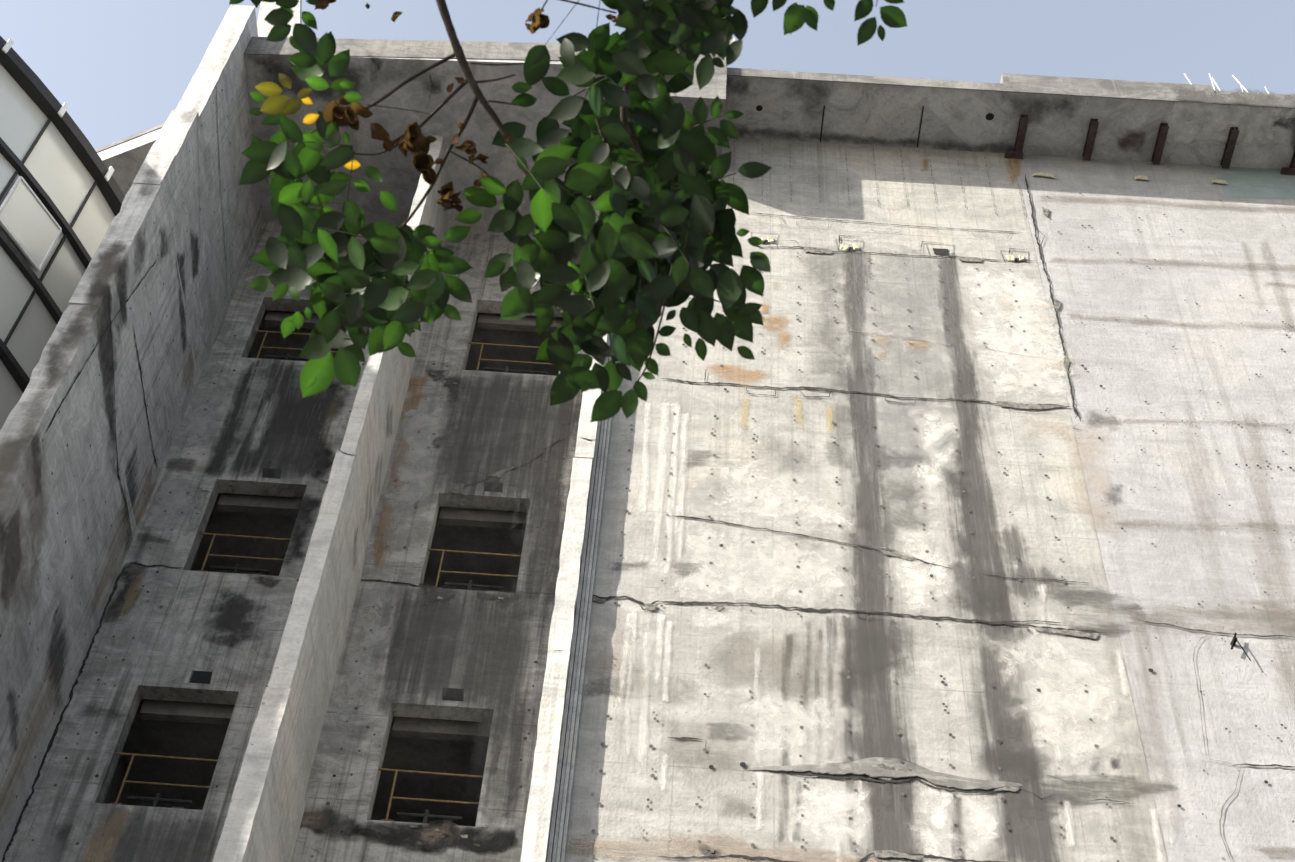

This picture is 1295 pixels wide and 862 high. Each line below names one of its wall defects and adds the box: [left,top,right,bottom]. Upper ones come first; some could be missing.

corrosion [1119,133,1143,148]
crack [661,174,1081,430]
leakage [0,243,126,501]
leakage [568,252,922,862]
leakage [939,253,1174,862]
leakage [48,614,65,691]
leakage [158,593,258,683]
crack [592,595,1107,639]
crack [789,763,1134,805]
spalling [300,810,517,853]
crack [658,854,798,862]
crack [859,850,1006,862]